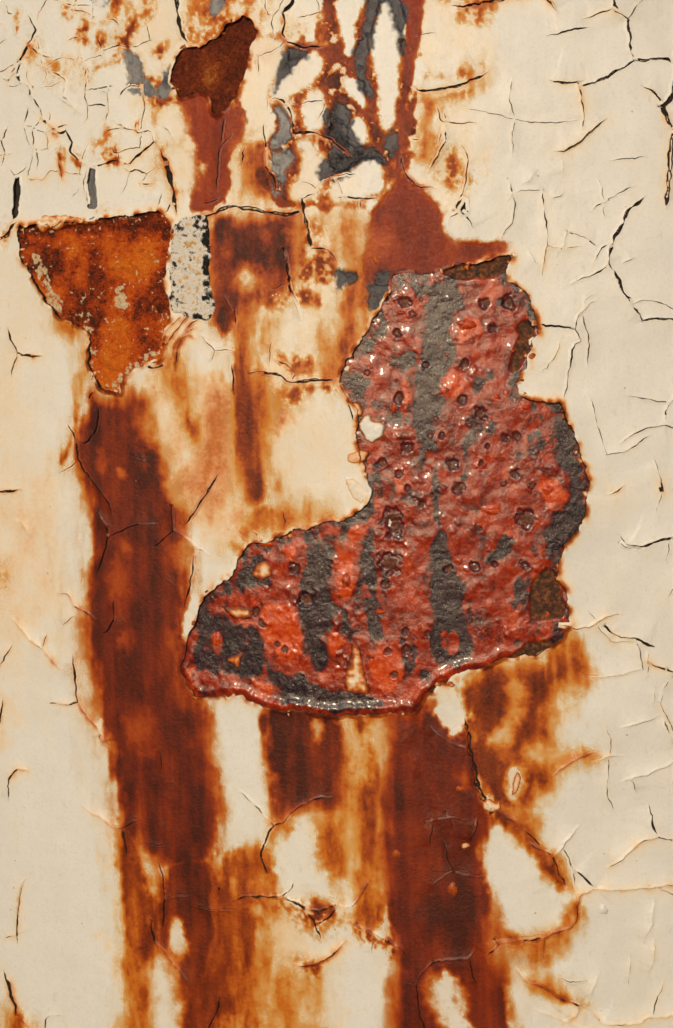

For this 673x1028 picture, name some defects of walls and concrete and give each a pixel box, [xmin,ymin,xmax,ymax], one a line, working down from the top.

peeling [10,165,175,398]
rust [93,126,119,167]
rust [62,0,157,77]
crack [0,0,380,321]
peeling [124,12,262,120]
rust [141,0,508,553]
crack [398,0,673,601]
peeling [177,251,594,721]
crack [0,591,125,748]
rust [53,317,599,1028]
crack [82,607,673,1028]
crack [2,969,74,1028]